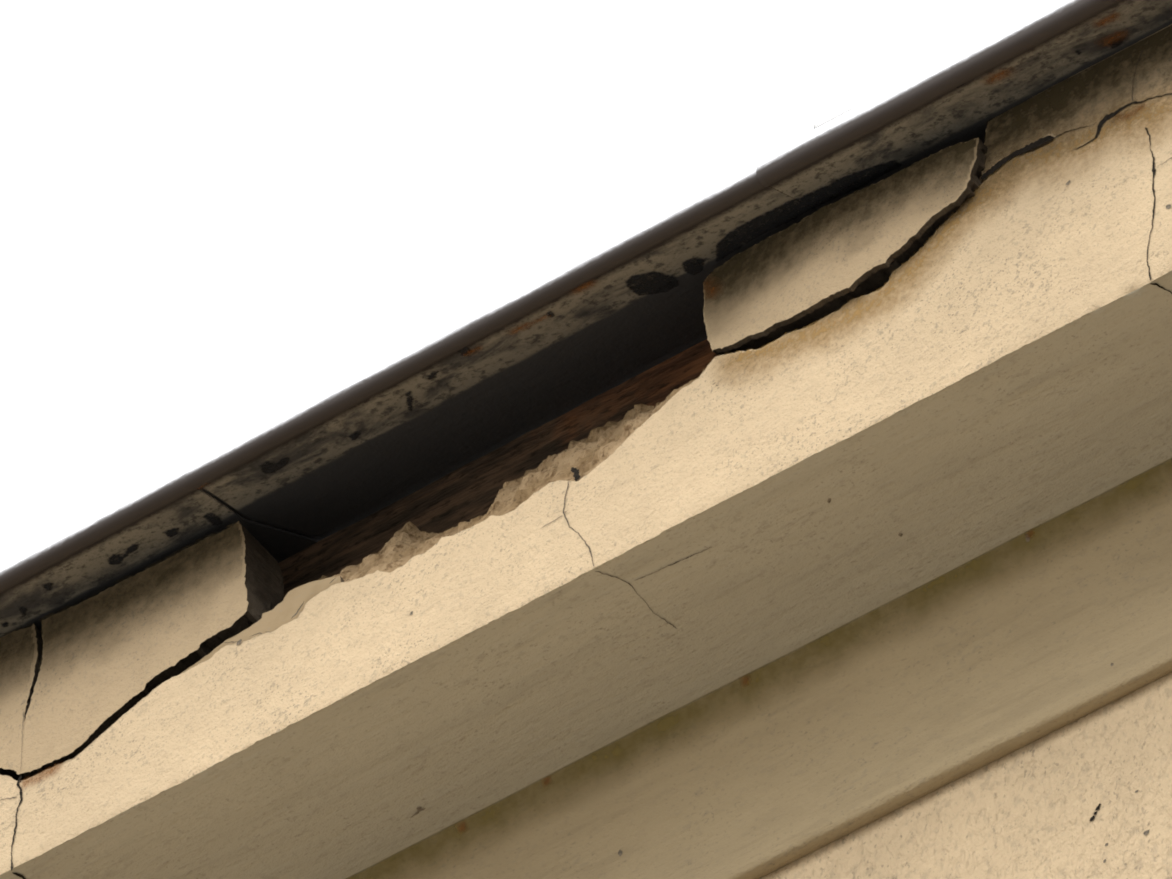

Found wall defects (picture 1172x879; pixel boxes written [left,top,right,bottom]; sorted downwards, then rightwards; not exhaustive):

peeling [626,161,902,296]
crack [981,52,1172,294]
peeling [109,544,138,565]
flaking render [177,363,710,676]
crack [543,481,711,629]
crack [1,713,26,879]